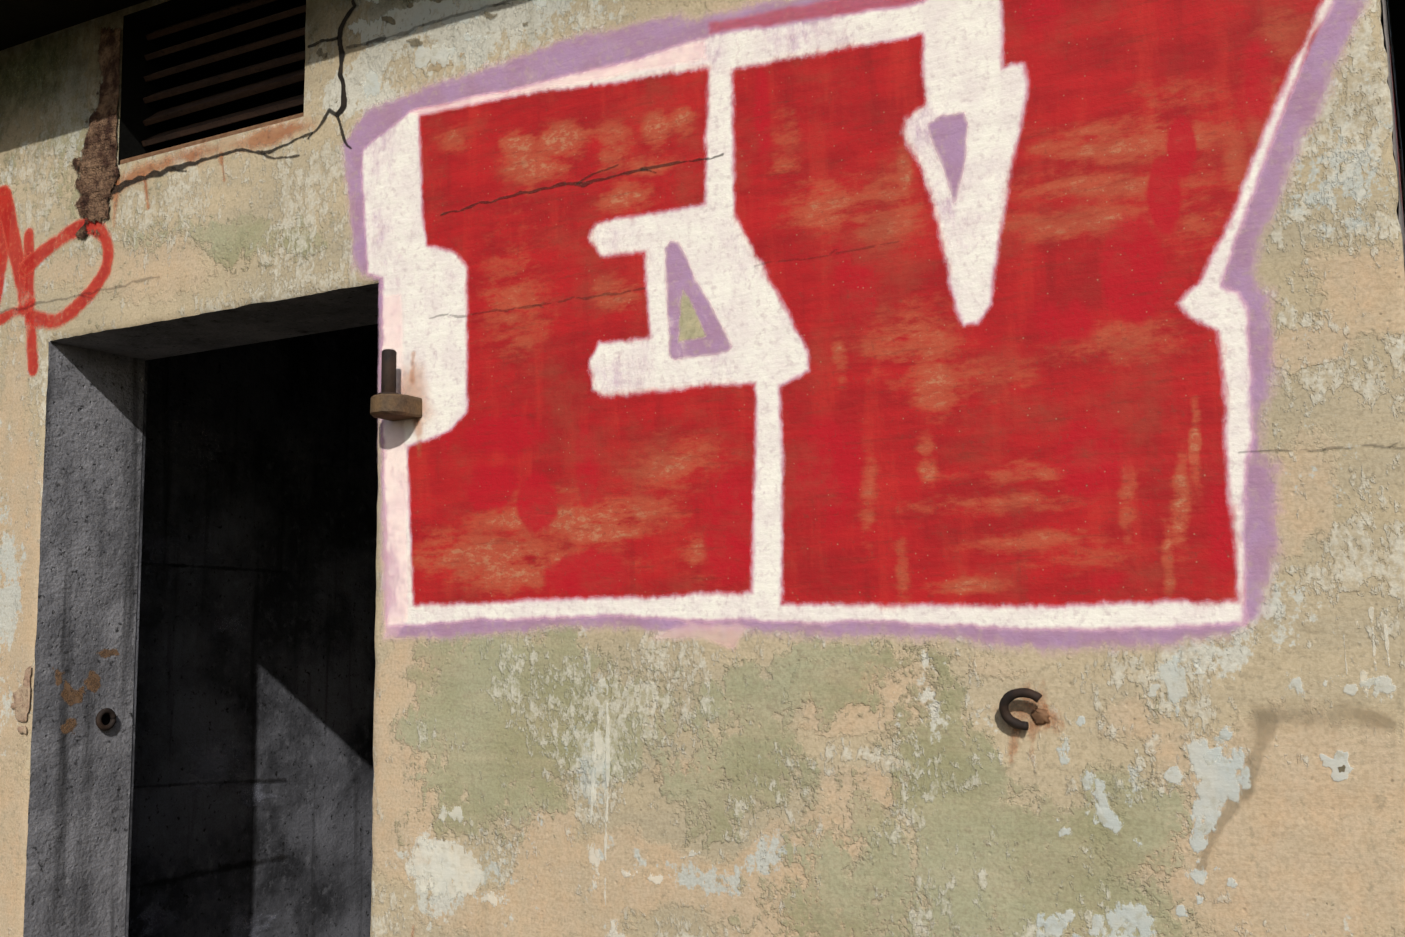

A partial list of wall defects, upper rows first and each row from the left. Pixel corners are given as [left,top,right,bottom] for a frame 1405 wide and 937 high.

peeling [348,0,513,72]
spalling [71,27,121,239]
crack [110,0,356,195]
peeling [438,806,463,823]
peeling [1164,726,1251,917]
peeling [405,836,507,907]
peeling [621,869,663,885]
peeling [1036,902,1155,937]